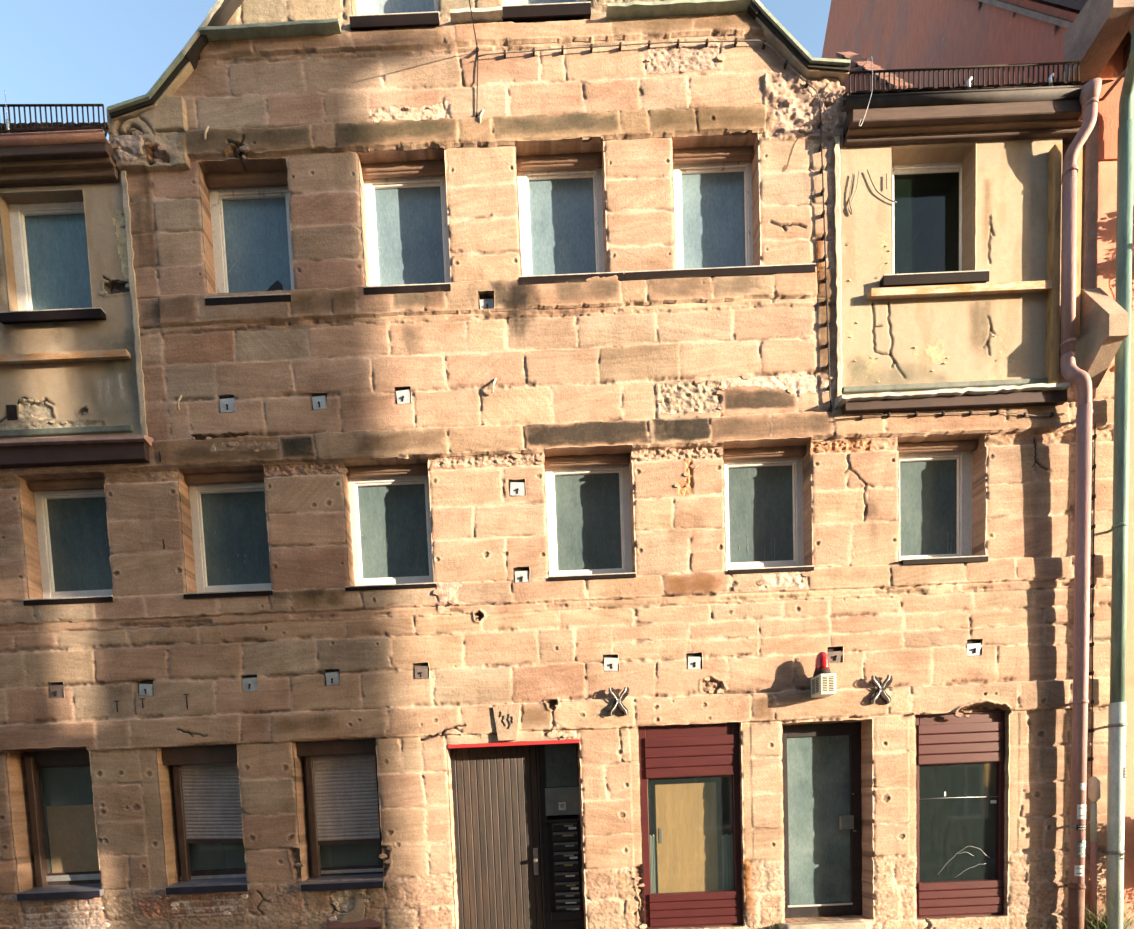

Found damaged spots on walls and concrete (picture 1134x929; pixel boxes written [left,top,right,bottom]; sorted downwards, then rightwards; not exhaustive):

spalling [775,97,836,135]
spalling [111,130,169,164]
crack [872,303,905,378]
flaking render [0,398,105,430]
spalling [657,370,837,415]
crack [846,455,871,520]